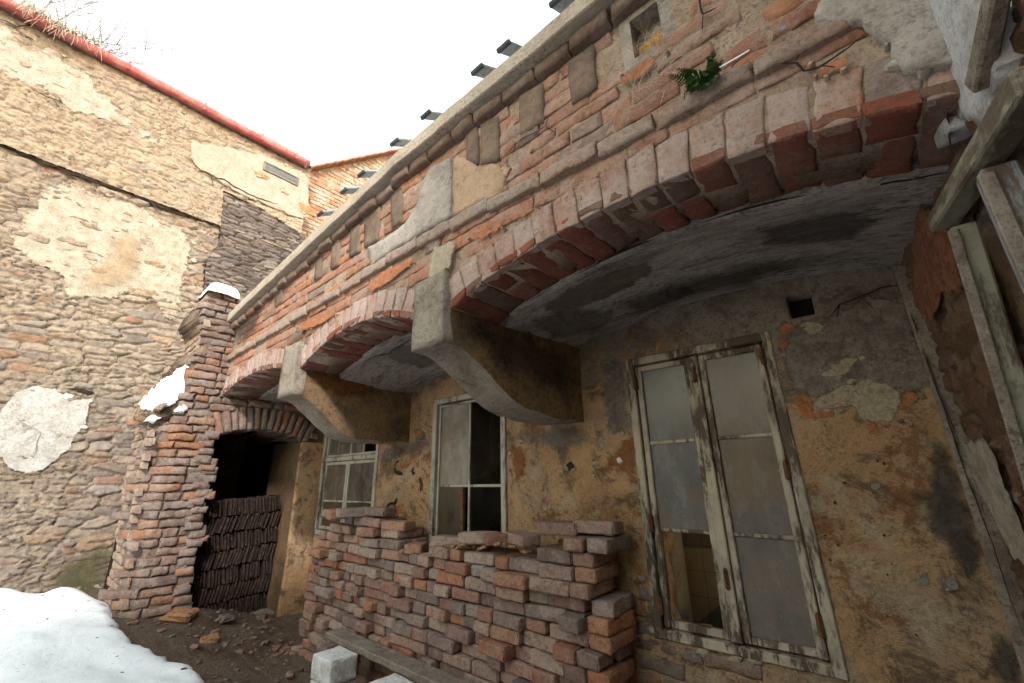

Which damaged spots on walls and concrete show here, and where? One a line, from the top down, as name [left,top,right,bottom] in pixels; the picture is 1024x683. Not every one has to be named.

spalling [807,56,850,82]
peeling [814,0,1024,149]
peeling [10,183,196,320]
crack [0,144,209,222]
peeling [191,142,318,220]
peeling [366,155,512,291]
spalling [911,204,961,321]
spalling [777,303,858,353]
peeling [0,386,93,473]
peeling [794,356,926,434]
damp [914,445,980,577]